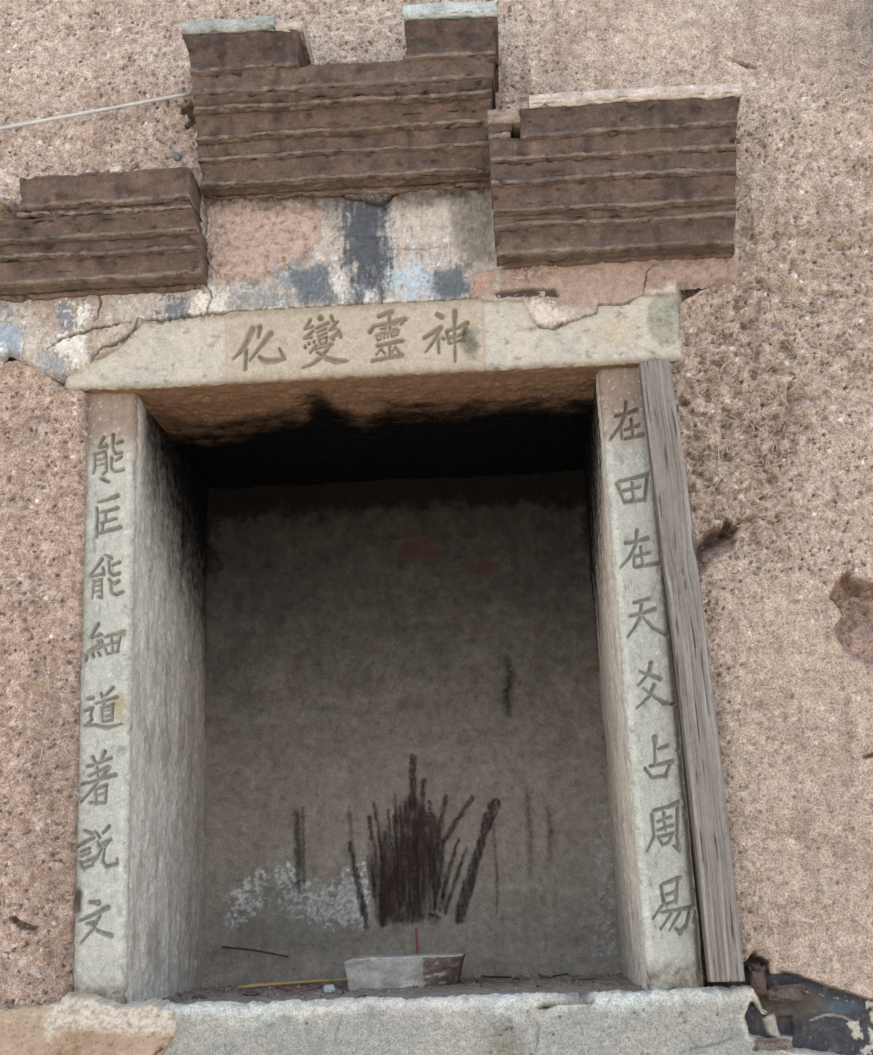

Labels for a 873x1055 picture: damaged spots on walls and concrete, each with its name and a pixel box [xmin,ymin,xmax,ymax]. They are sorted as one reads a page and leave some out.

peeling [154,195,578,331]
damp [250,187,489,305]
peeling [0,297,142,382]
spalling [828,570,873,670]
damp [224,861,372,932]
peeling [728,953,873,1055]